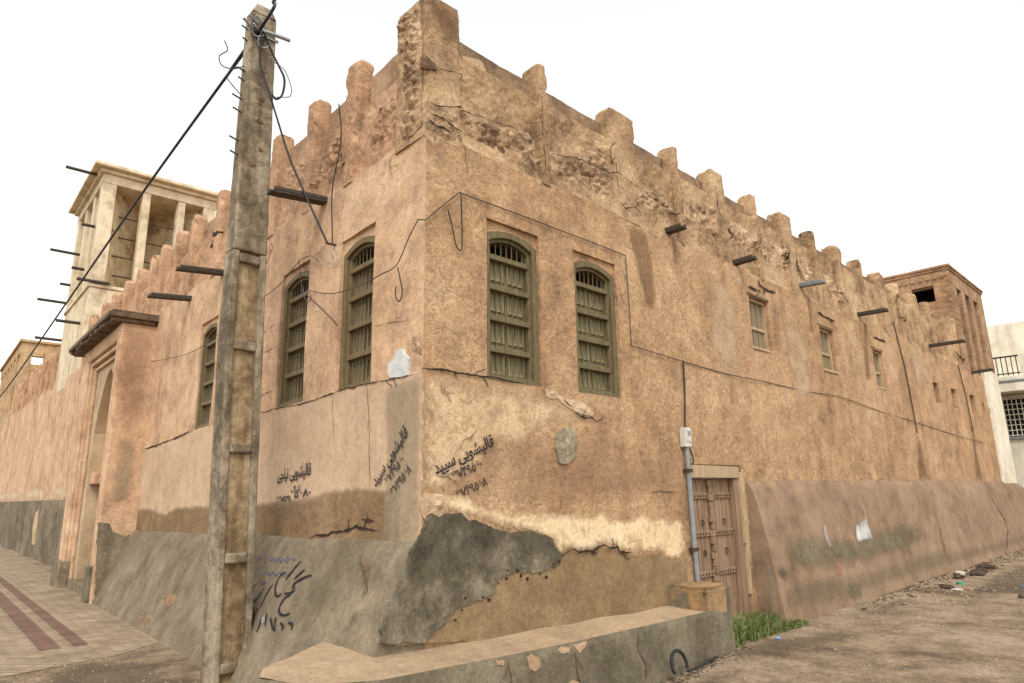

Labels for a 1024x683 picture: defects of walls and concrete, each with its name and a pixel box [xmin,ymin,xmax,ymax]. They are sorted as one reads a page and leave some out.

flaking render [370,1,611,196]
crack [262,368,523,483]
flaking render [543,388,594,416]
leakage [136,508,209,534]
leakage [256,490,400,542]
crack [310,514,377,539]
flaking render [392,489,688,646]
crack [562,539,635,560]